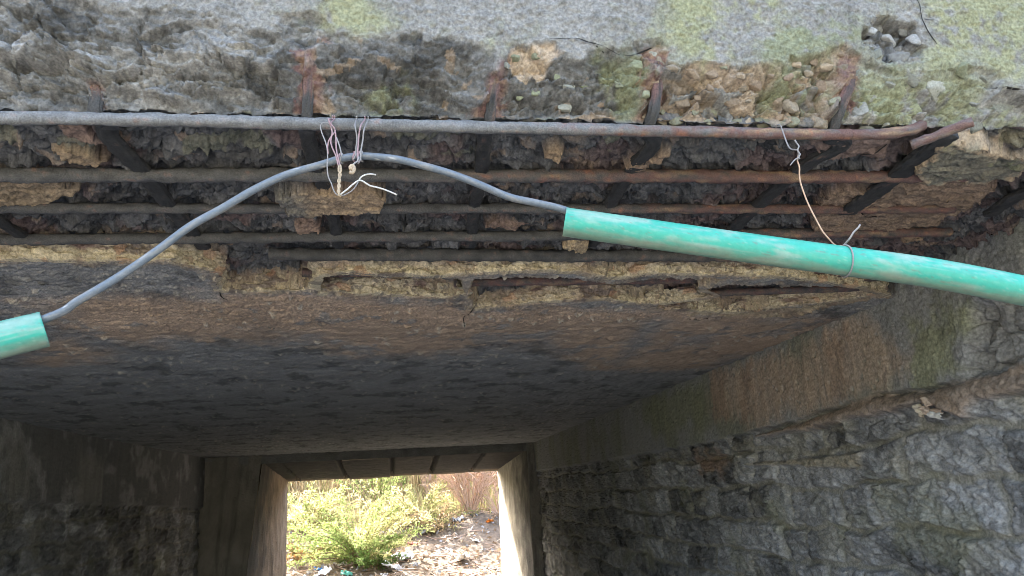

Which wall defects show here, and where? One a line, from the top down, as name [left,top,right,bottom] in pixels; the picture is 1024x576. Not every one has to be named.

rust [289,48,325,116]
spalling [0,0,1024,319]